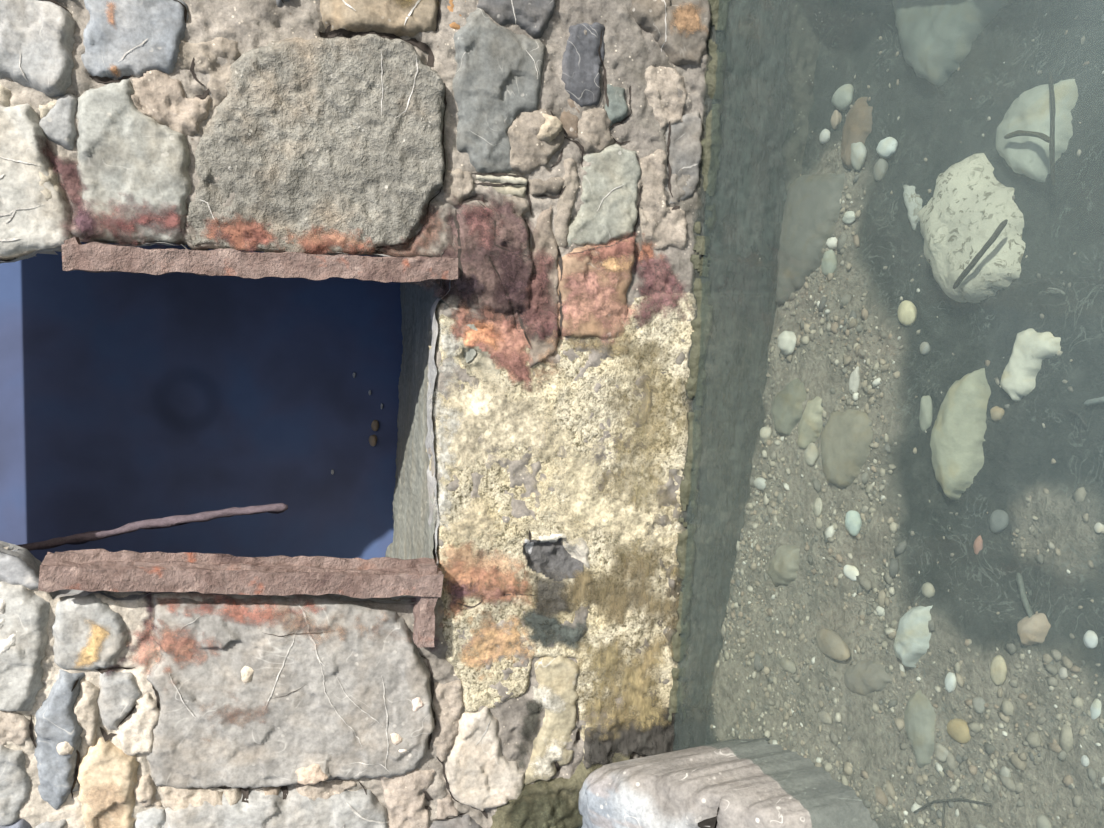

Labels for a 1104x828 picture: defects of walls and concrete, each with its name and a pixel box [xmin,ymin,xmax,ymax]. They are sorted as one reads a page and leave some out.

corrosion [39,138,182,242]
corrosion [207,219,274,250]
corrosion [291,196,683,390]
corrosion [443,545,530,615]
corrosion [106,591,202,674]
corrosion [168,595,344,640]
corrosion [462,618,534,679]